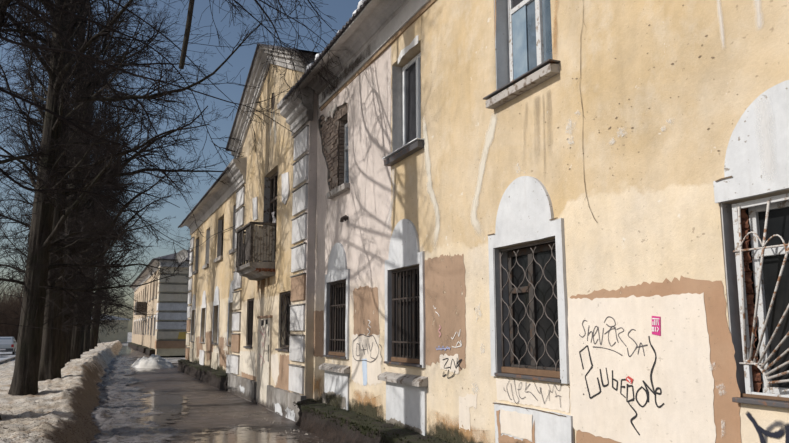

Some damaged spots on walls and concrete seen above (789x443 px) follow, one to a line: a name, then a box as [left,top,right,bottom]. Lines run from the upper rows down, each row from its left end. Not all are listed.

flaking render [318,102,348,191]
damp [322,46,370,100]
crack [578,23,597,222]
flaking render [741,208,763,392]